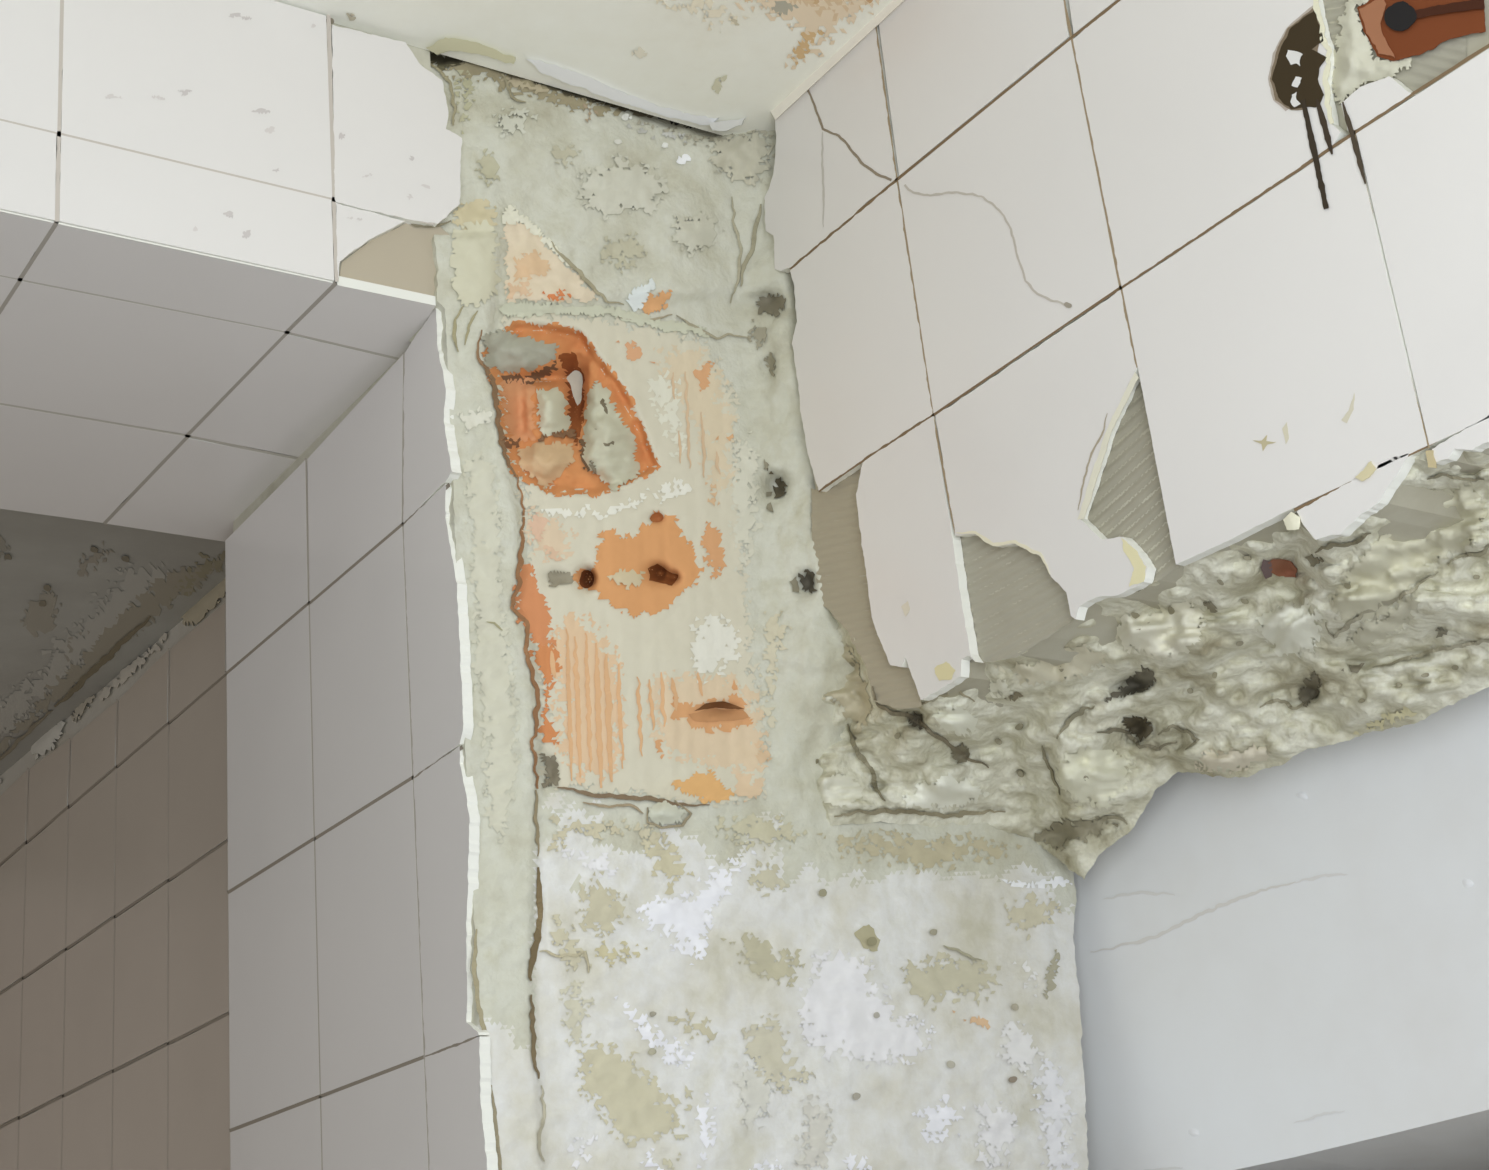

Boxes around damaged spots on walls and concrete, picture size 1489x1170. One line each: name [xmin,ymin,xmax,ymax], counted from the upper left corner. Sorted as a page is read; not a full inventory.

peeling [427,38,773,148]
crack [807,90,1064,305]
spalling [479,278,1489,897]
flaking render [30,721,66,760]
crack [452,306,710,1170]
peeling [720,932,806,987]
peeling [854,925,880,952]
peeling [900,929,1003,1011]
peeling [1001,891,1062,941]
peeling [550,871,693,1170]
peeling [650,1009,718,1043]
peeling [741,1013,816,1094]